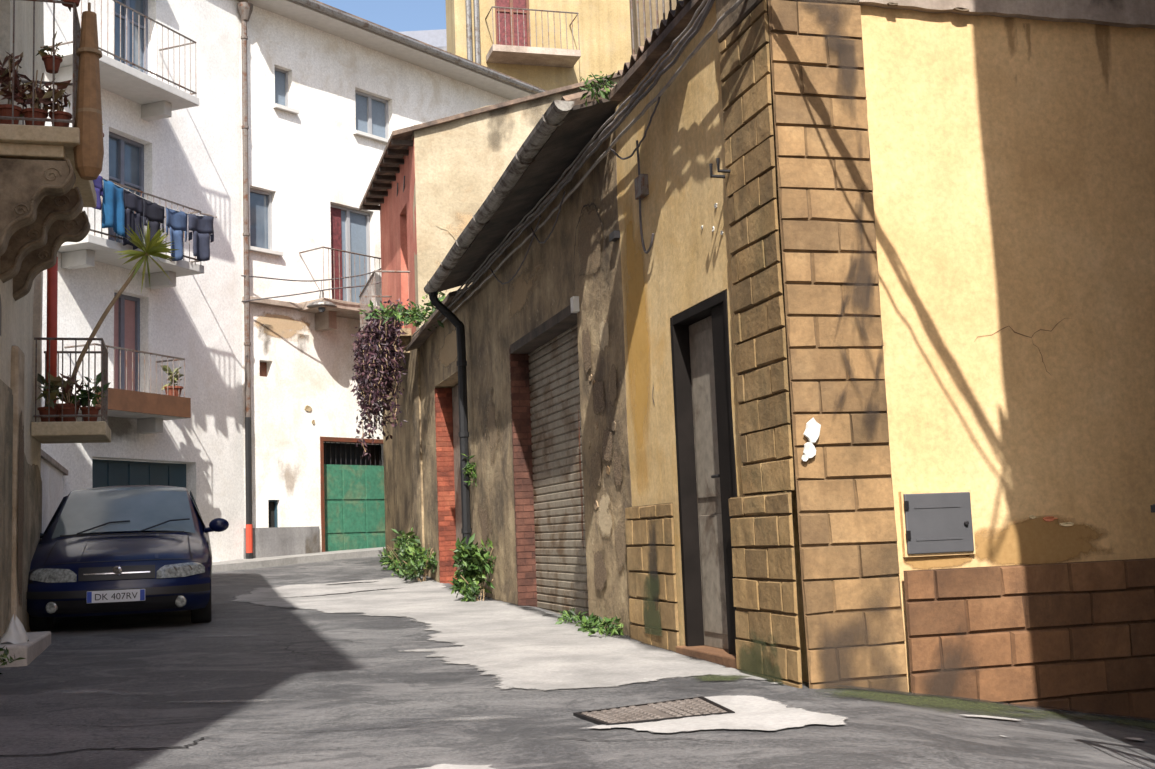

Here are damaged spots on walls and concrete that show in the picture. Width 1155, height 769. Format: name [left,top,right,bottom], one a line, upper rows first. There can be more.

water stain [853,259,870,310]
flaking render [256,314,310,349]
crack [976,318,1065,374]
water stain [905,515,1104,570]